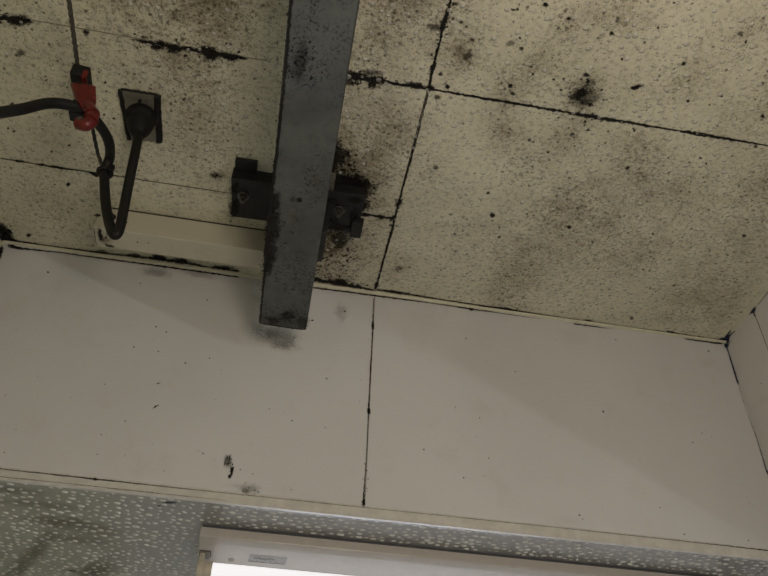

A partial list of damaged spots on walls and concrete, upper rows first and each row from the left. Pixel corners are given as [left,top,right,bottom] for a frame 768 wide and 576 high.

damp [0,9,33,31]
damp [121,1,255,64]
damp [0,152,99,177]
damp [257,0,326,330]
damp [313,0,768,506]